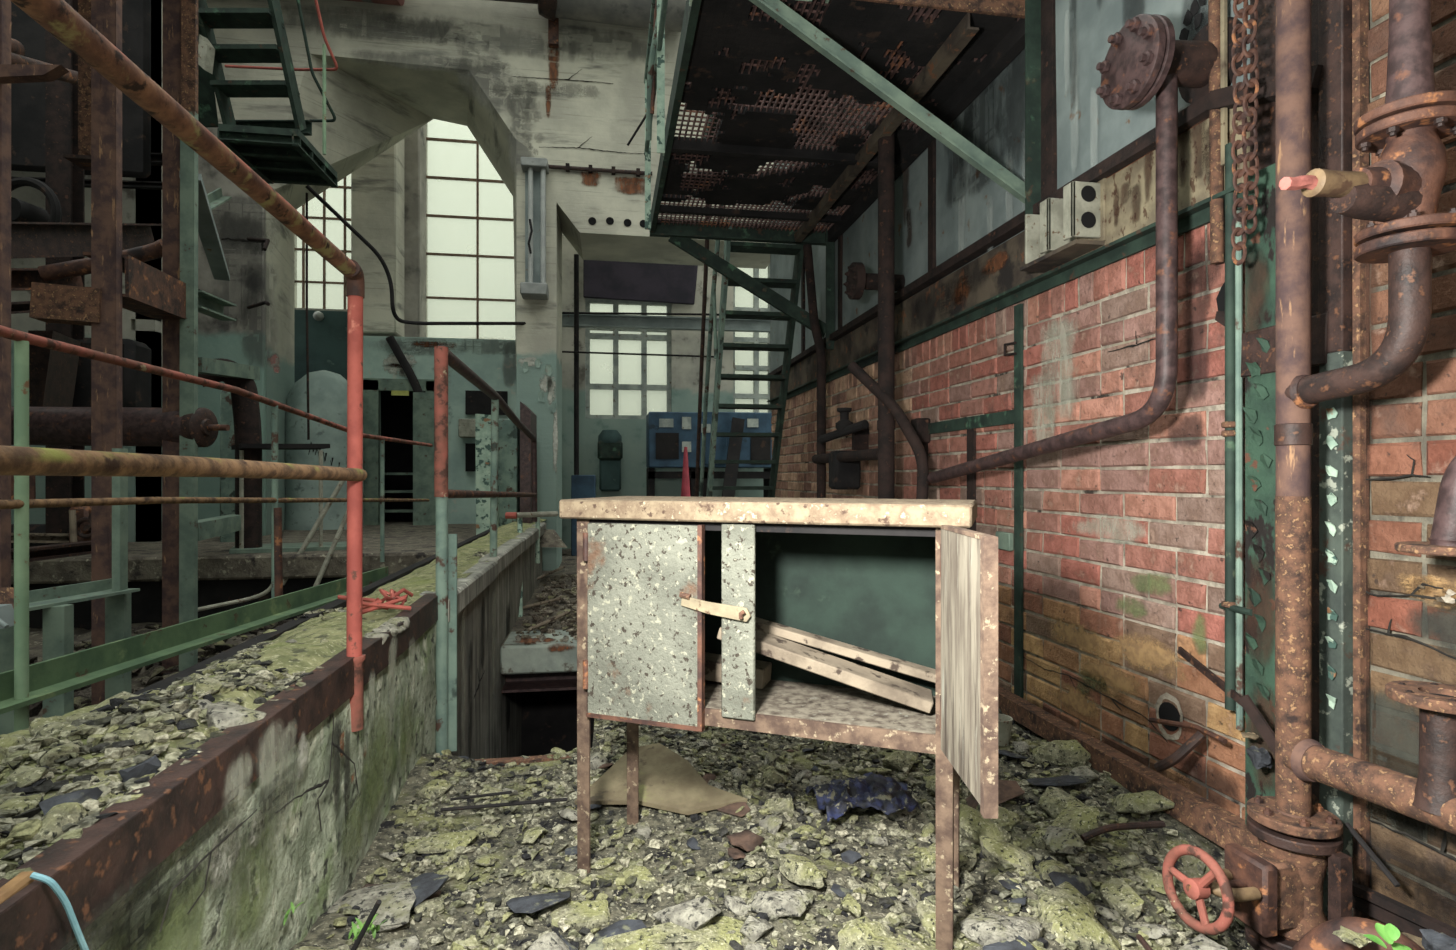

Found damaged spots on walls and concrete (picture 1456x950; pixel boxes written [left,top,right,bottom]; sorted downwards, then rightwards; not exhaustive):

corrosion [546,48,559,117]
peeling [1242,338,1272,701]
peeling [1325,407,1338,709]
damp [1413,597,1456,656]
damp [333,721,350,820]
damp [1366,690,1419,778]
damp [63,771,294,950]
damp [1366,802,1456,840]